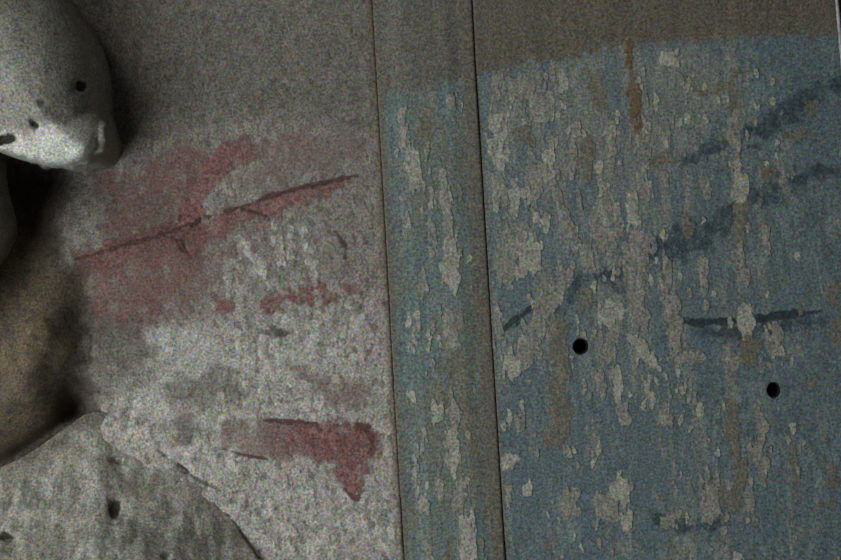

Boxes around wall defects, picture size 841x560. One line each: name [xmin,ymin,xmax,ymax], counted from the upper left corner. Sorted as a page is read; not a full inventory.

corrosion [625,40,643,139]
peeling [394,106,472,376]
peeling [485,48,841,471]
peeling [412,388,486,560]
peeling [503,478,532,510]
peeling [546,485,582,524]
peeling [591,470,634,556]
peeling [660,509,689,529]
peeling [679,401,780,560]